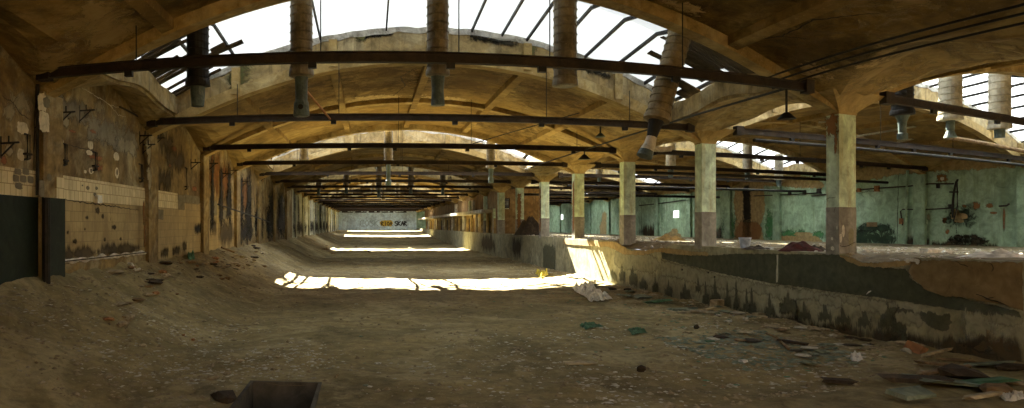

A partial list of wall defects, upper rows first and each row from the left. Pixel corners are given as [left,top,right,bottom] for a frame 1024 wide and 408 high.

flaking render [3,89,50,134]
flaking render [1,144,52,197]
damp [195,159,328,245]
damp [65,242,139,264]
damp [856,223,913,245]
flaking render [765,206,1024,310]
damp [609,252,1022,362]